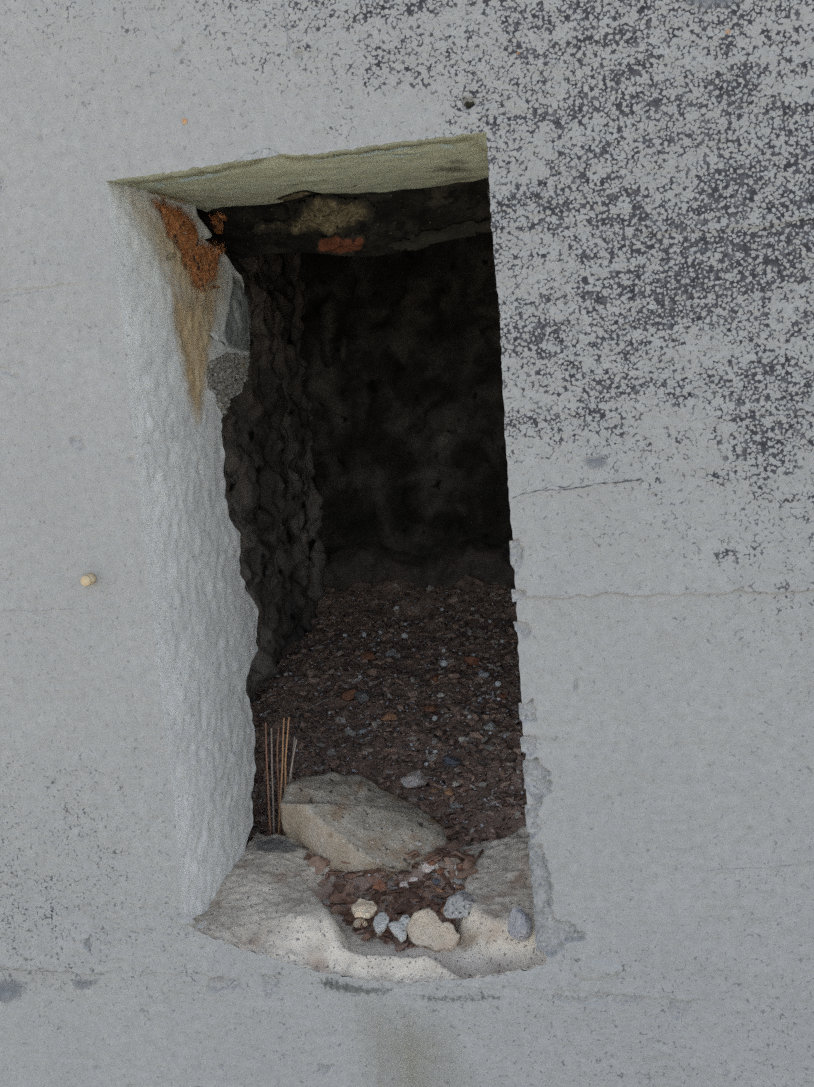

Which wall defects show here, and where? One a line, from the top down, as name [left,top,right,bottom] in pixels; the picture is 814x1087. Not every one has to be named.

corrosion [149,192,225,414]
spalling [509,539,522,573]
spalling [511,589,524,602]
spalling [513,622,531,635]
spalling [519,701,536,722]
spalling [520,736,587,956]